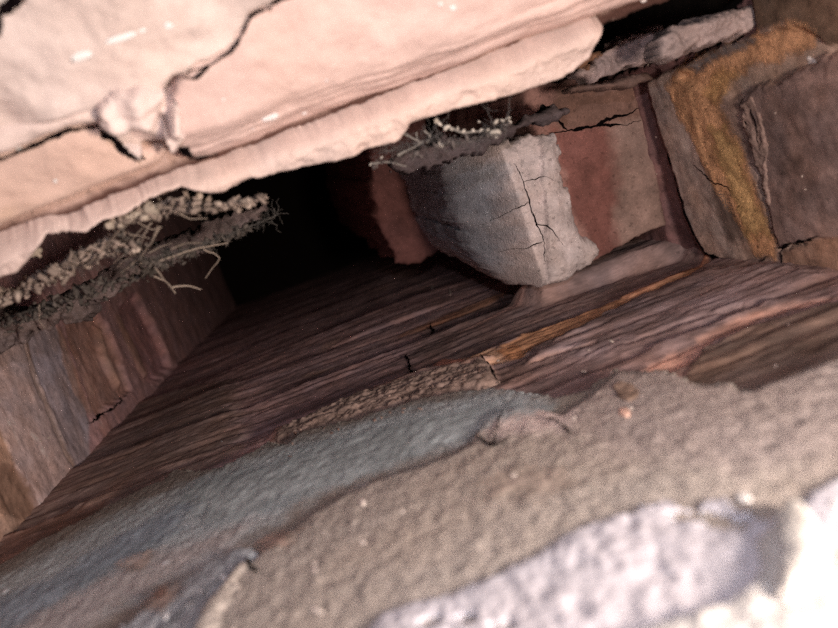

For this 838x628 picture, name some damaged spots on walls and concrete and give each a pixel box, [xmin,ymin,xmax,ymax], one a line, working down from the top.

crack [164,0,282,96]
crack [554,108,641,133]
crack [492,166,565,261]